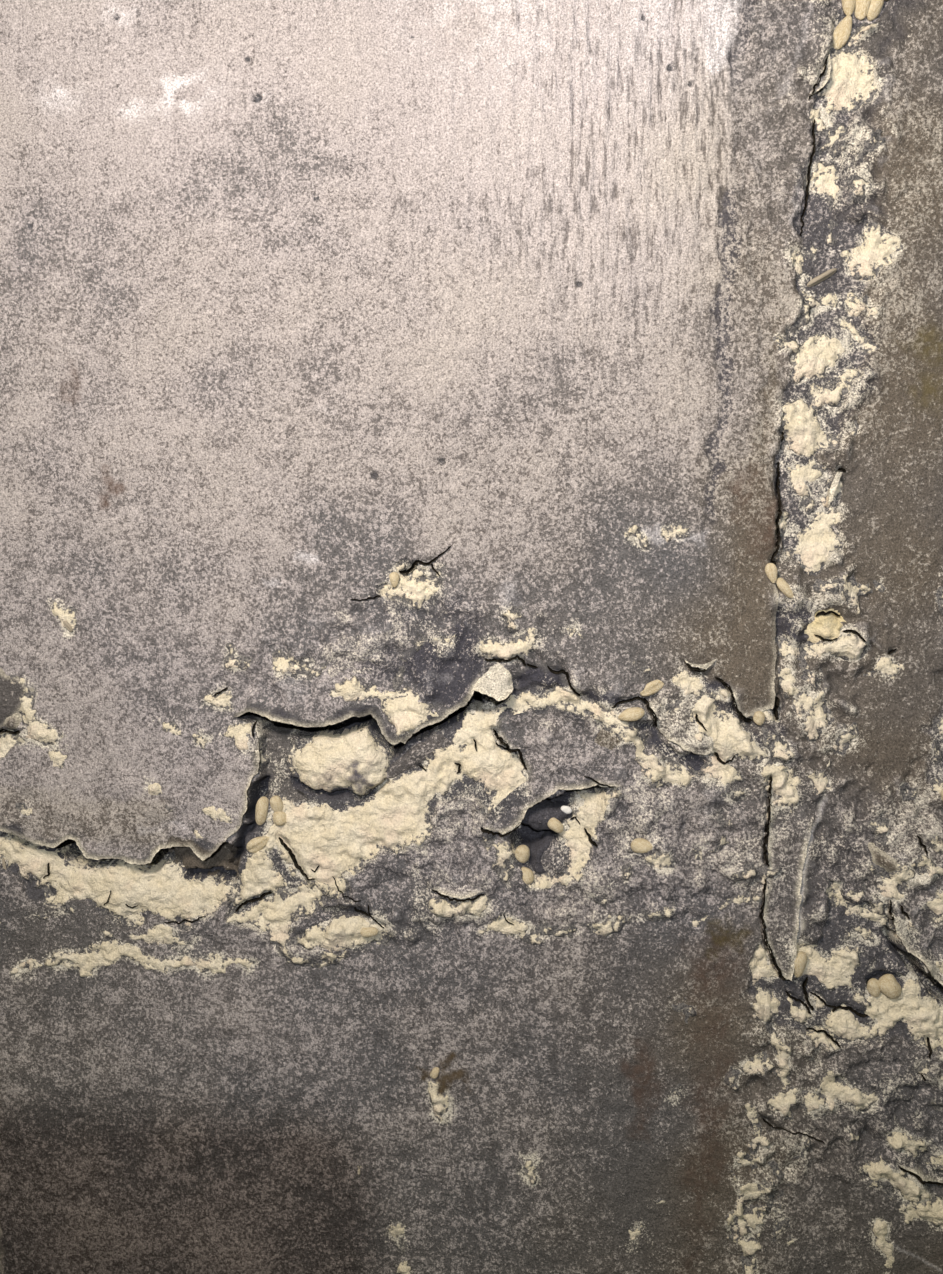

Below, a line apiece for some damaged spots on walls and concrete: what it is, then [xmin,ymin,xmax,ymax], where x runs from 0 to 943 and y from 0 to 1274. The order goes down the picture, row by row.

crack [800,56,828,236]
crack [771,432,784,565]
peeling [0,645,712,942]
crack [889,900,910,920]
crack [921,1037,932,1081]
water stain [724,1022,794,1274]
water stain [860,1156,943,1227]
water stain [886,1132,943,1170]
crack [898,1165,943,1186]
water stain [872,1219,895,1268]